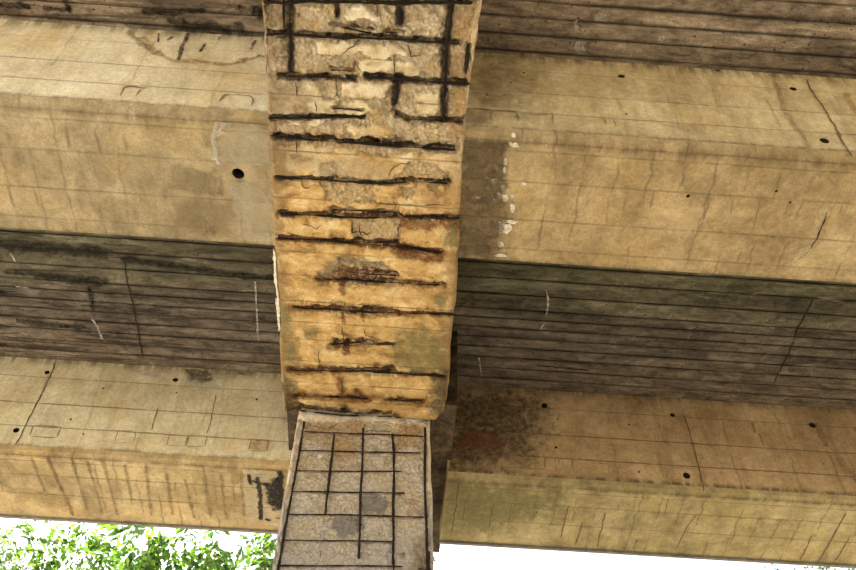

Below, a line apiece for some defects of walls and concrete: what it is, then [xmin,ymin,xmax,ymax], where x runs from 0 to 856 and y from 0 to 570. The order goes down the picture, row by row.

corrosion [270,132,455,149]
corrosion [264,0,471,125]
spalling [265,0,482,200]
crack [807,80,853,156]
spalling [319,161,402,249]
leakage [456,140,508,259]
peeling [273,247,281,331]
corrosion [288,266,451,322]
crack [16,360,61,443]
corrosion [285,362,447,418]
spalling [245,402,436,570]
crack [800,514,849,563]